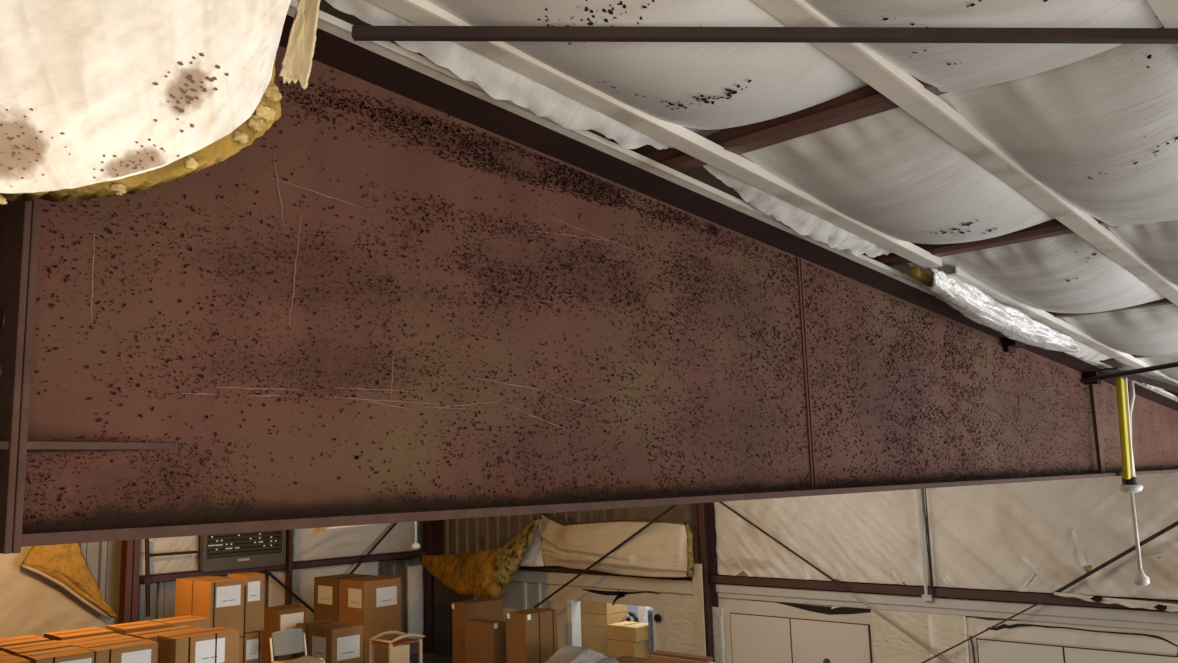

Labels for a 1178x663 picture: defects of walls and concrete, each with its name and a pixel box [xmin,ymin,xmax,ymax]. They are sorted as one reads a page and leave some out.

mould [661,80,752,110]
rust [37,73,1120,507]
rust [22,435,256,526]